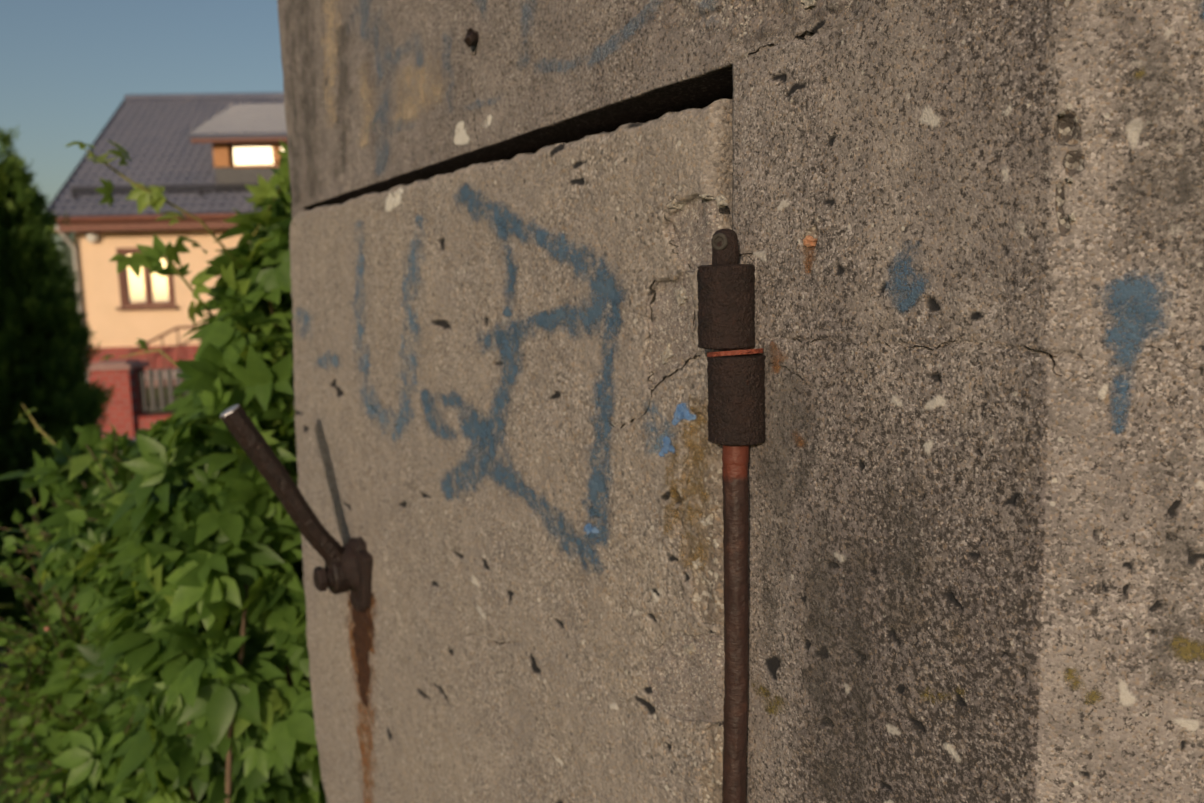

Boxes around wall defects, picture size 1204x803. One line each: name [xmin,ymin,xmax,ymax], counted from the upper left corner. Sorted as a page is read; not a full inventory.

crack [608,280,700,428]
crack [664,196,703,270]
spalling [644,194,728,386]
crack [769,338,821,385]
crack [854,337,958,350]
corrosion [348,593,375,803]